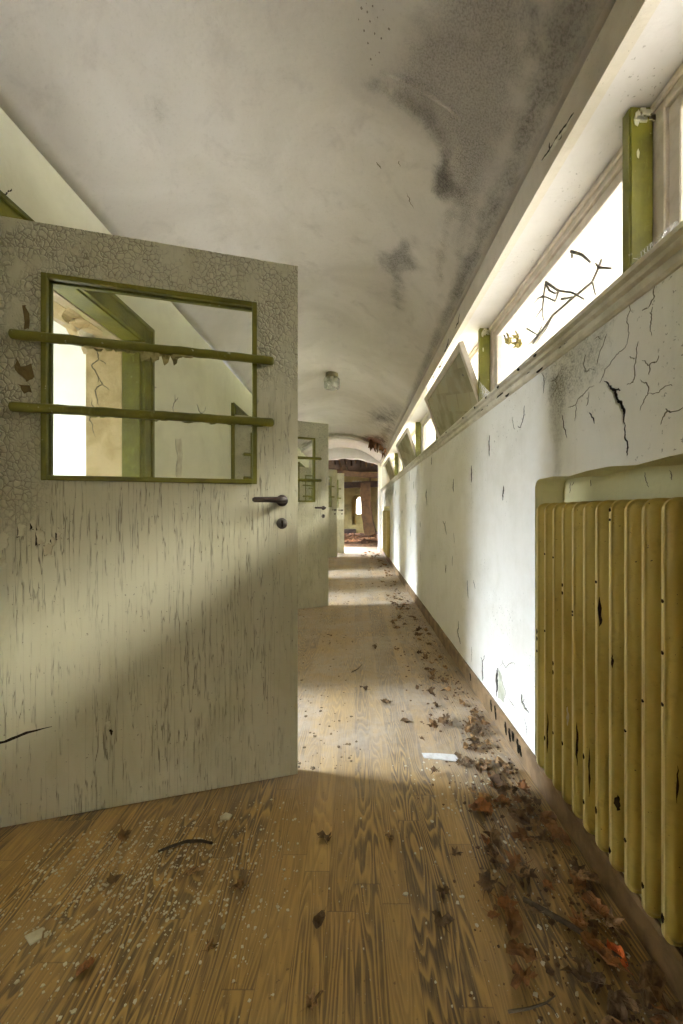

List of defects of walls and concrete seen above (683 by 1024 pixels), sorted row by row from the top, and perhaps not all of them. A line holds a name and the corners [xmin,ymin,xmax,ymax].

crack [512,286,683,455]